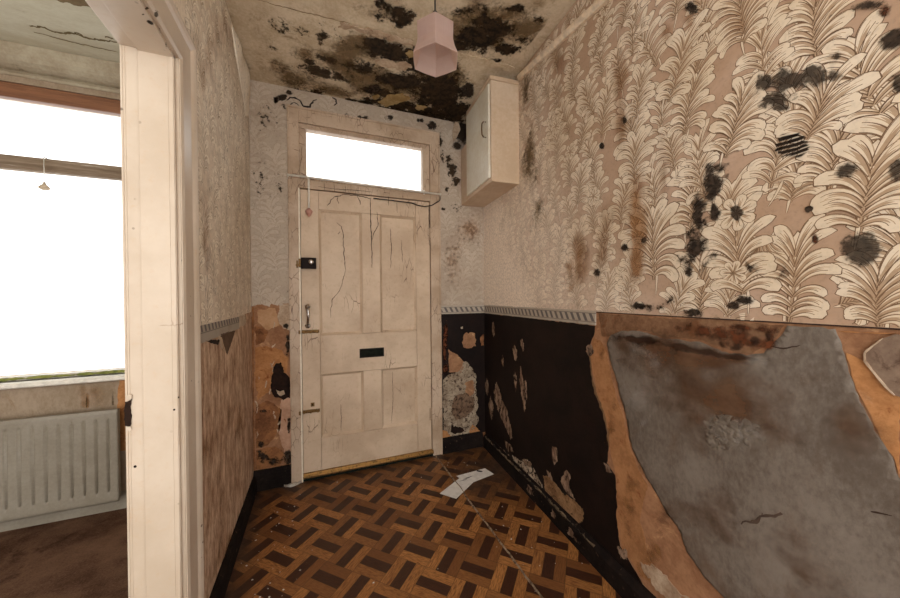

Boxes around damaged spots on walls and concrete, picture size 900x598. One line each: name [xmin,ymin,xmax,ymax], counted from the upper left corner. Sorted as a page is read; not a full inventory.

damp [258,0,543,192]
damp [677,162,744,277]
damp [727,296,753,309]
damp [774,133,809,158]
damp [756,65,839,111]
damp [834,163,858,178]
damp [841,232,882,266]
damp [878,28,900,49]
flaking render [253,303,291,470]
flaking render [442,322,584,538]
peeling [586,314,785,598]
flaking render [846,353,900,473]